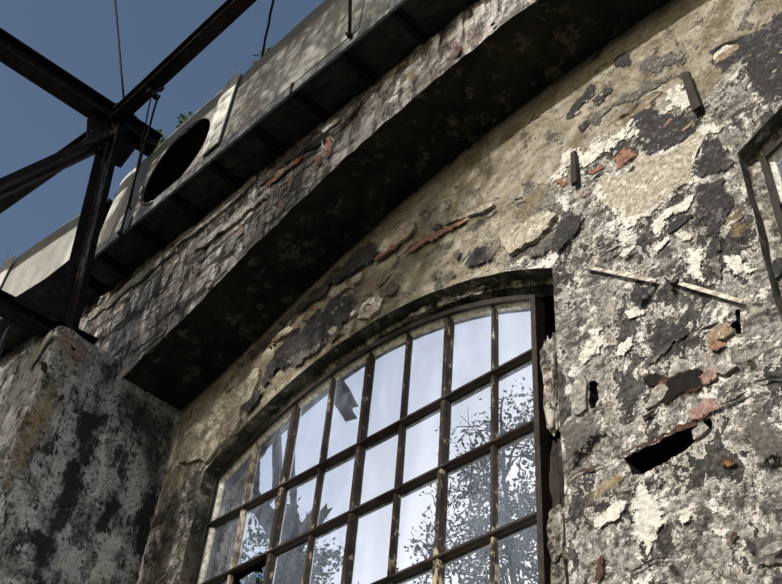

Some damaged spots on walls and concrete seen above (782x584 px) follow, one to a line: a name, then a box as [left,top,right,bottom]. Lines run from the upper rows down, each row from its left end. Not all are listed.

spalling [707,11,782,106]
spalling [565,46,701,172]
spalling [693,137,737,177]
spalling [88,99,362,320]
spalling [642,320,740,418]
spalling [687,391,747,420]
spalling [698,310,741,351]